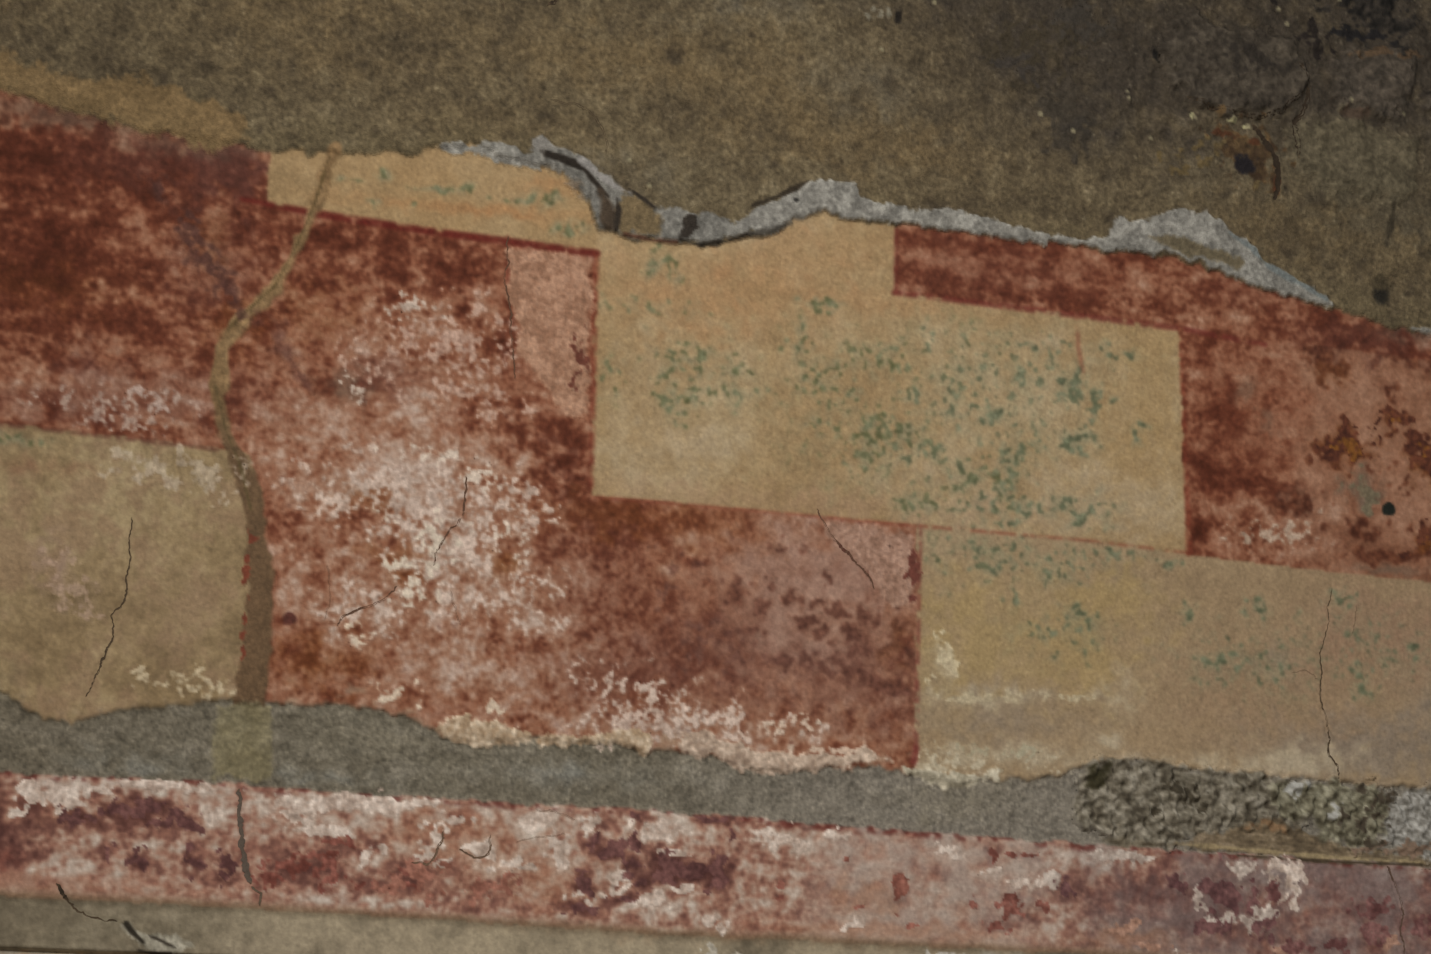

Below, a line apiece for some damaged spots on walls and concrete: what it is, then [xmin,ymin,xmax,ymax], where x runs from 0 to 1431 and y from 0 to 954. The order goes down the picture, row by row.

spalling [435,130,1335,311]
water stain [333,276,548,429]
crack [205,138,345,906]
water stain [14,373,581,658]
crack [86,517,133,696]
spalling [432,711,655,759]
spalling [675,726,1004,794]
crack [1292,591,1357,782]
crack [56,883,116,922]
water stain [56,791,523,910]
water stain [553,809,746,917]
peeling [749,820,852,859]